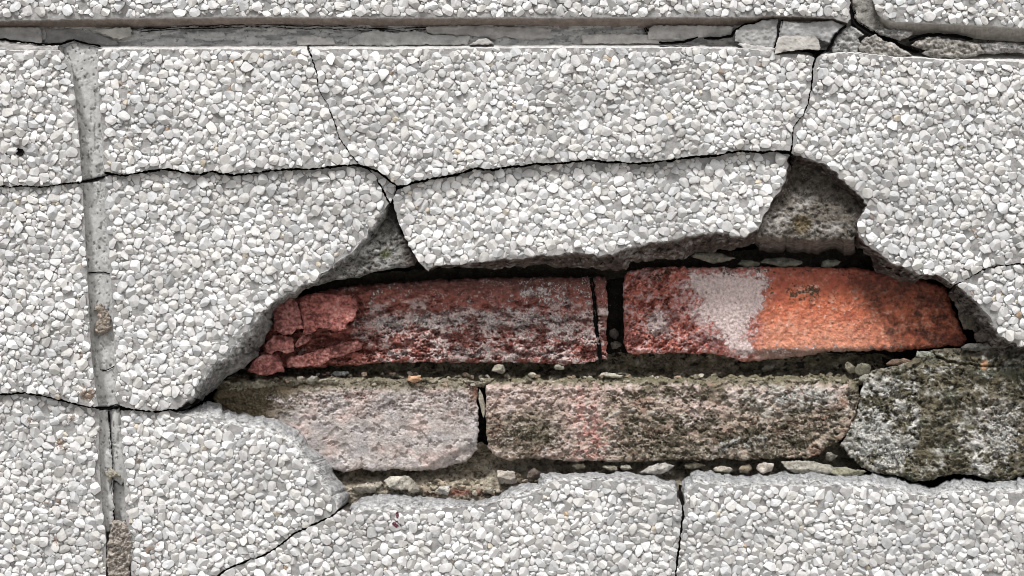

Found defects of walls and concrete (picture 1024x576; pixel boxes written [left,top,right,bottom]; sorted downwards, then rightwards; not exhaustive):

crack [0,0,973,248]
spalling [423,154,1024,350]
crack [0,392,200,520]
crack [217,502,351,576]
spalling [177,204,1024,514]
crack [675,485,685,576]